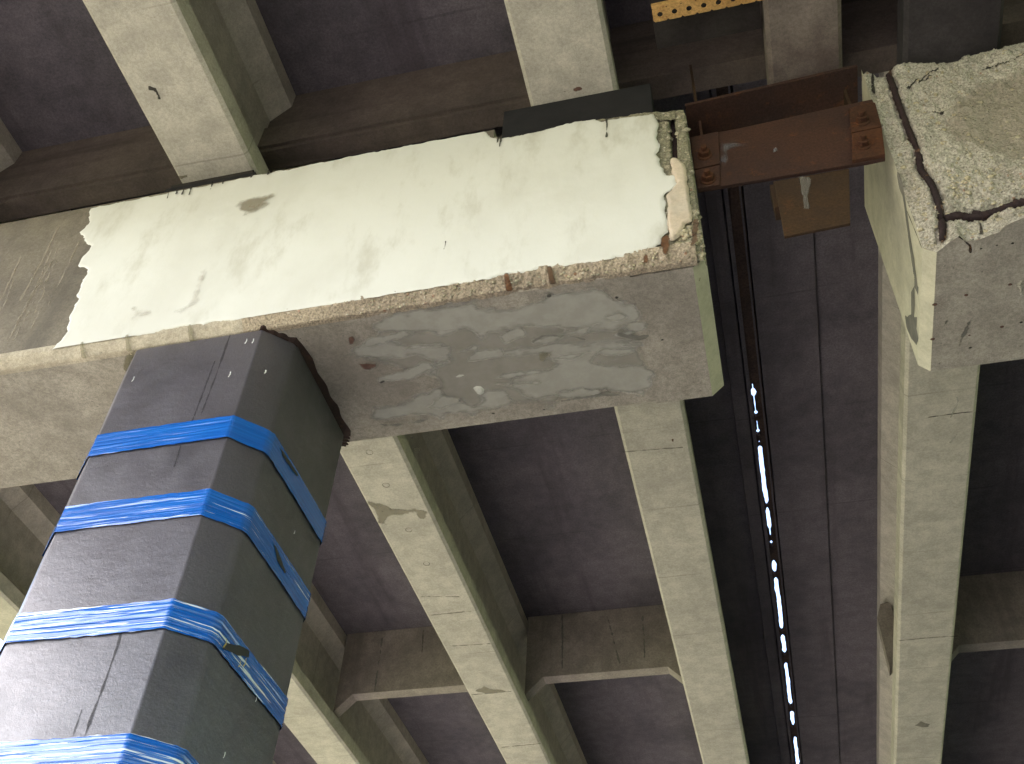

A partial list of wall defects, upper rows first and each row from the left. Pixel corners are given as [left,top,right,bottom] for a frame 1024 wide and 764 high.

crack [907,67,939,89]
spalling [861,43,1024,252]
leakage [241,195,271,211]
spalling [242,110,707,419]
leakage [368,502,426,523]